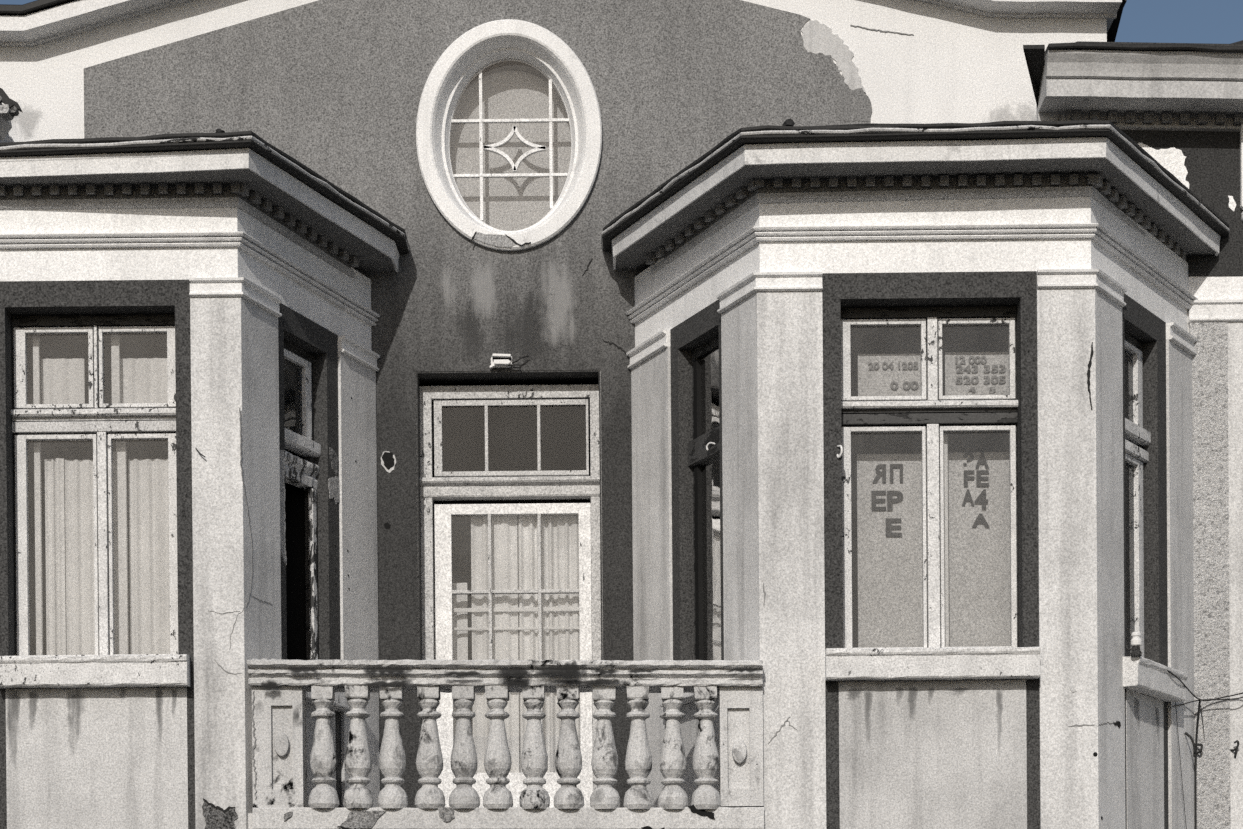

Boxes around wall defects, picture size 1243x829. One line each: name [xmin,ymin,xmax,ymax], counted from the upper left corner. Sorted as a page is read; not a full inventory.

peeling [800,19,872,123]
peeling [1138,143,1189,189]
crack [1086,342,1094,410]
peeling [279,449,287,565]
crack [214,408,270,799]
damp [12,693,36,712]
flaking render [202,798,238,829]